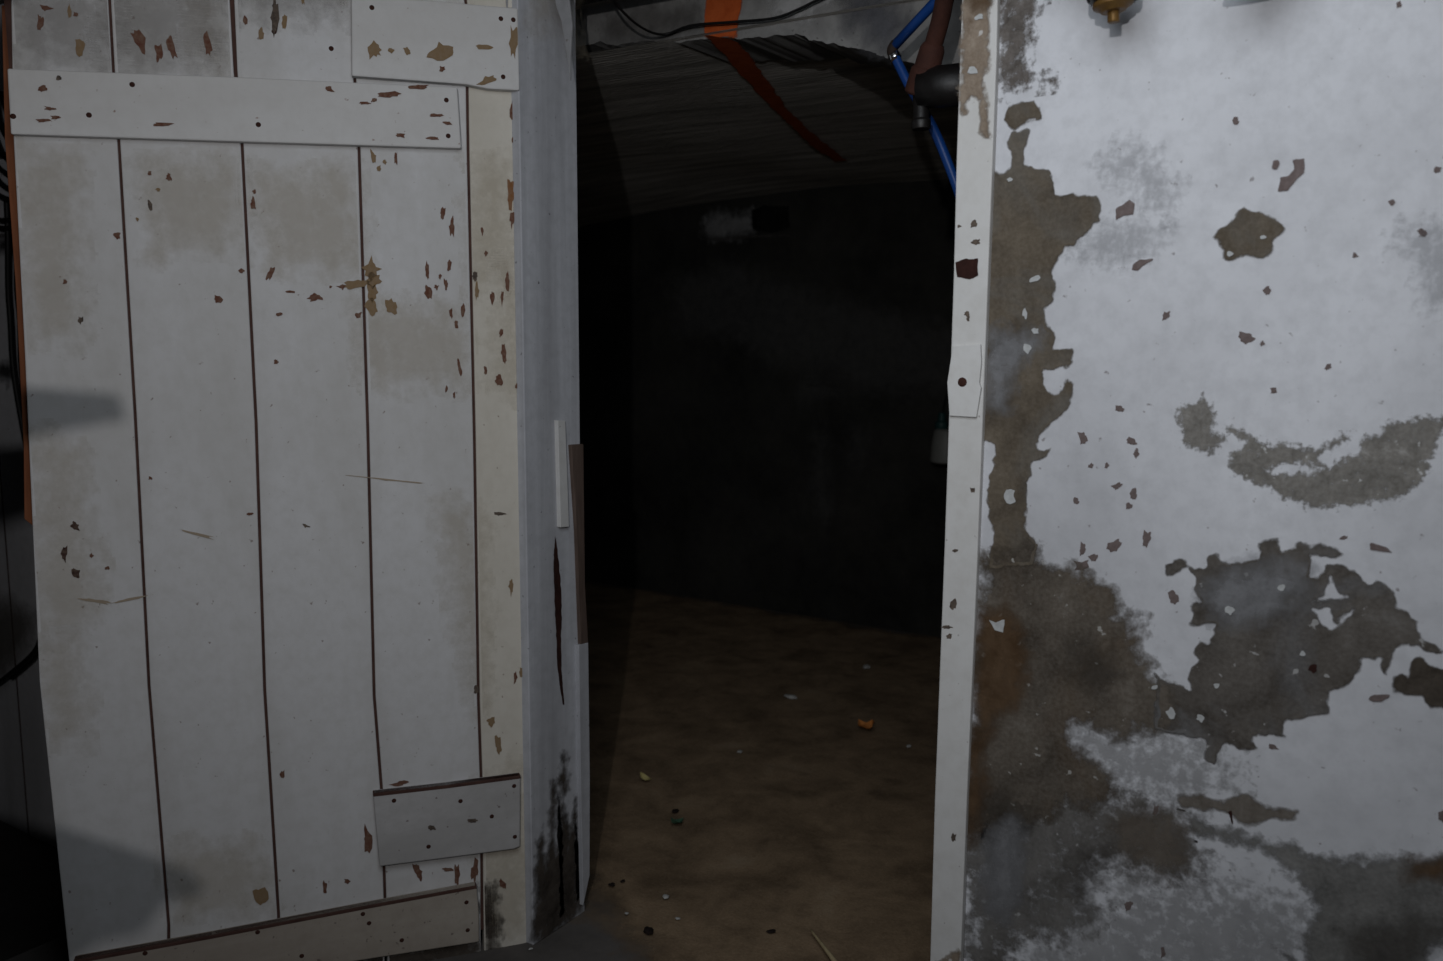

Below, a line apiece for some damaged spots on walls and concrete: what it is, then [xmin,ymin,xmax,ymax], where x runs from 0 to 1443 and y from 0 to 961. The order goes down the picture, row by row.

peeling [957,101,1137,570]
spalling [1214,208,1285,260]
peeling [1175,392,1443,510]
peeling [941,598,957,639]
leakage [963,541,1443,961]
peeling [1154,536,1443,764]